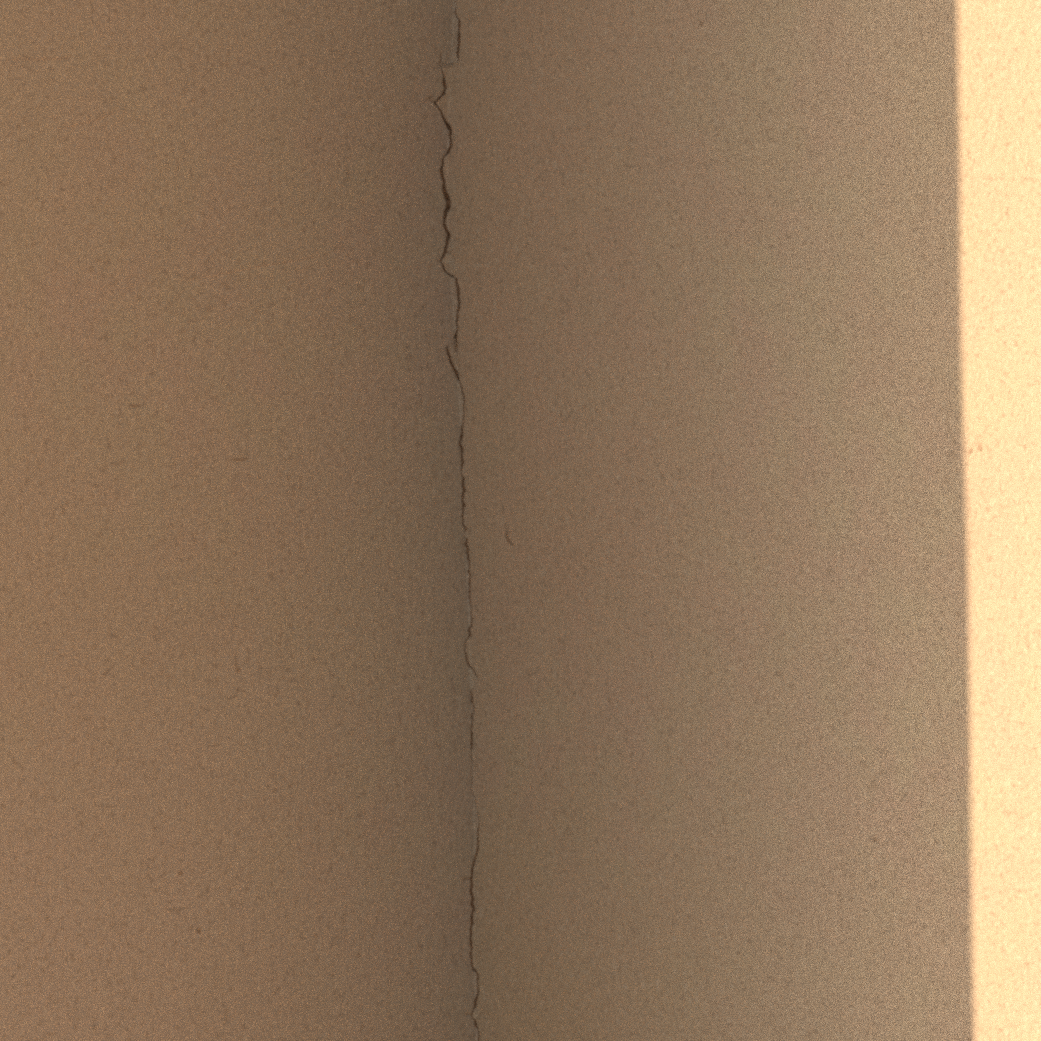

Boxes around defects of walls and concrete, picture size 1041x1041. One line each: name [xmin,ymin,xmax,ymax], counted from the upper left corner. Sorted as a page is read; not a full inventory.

crack [428,0,485,1041]